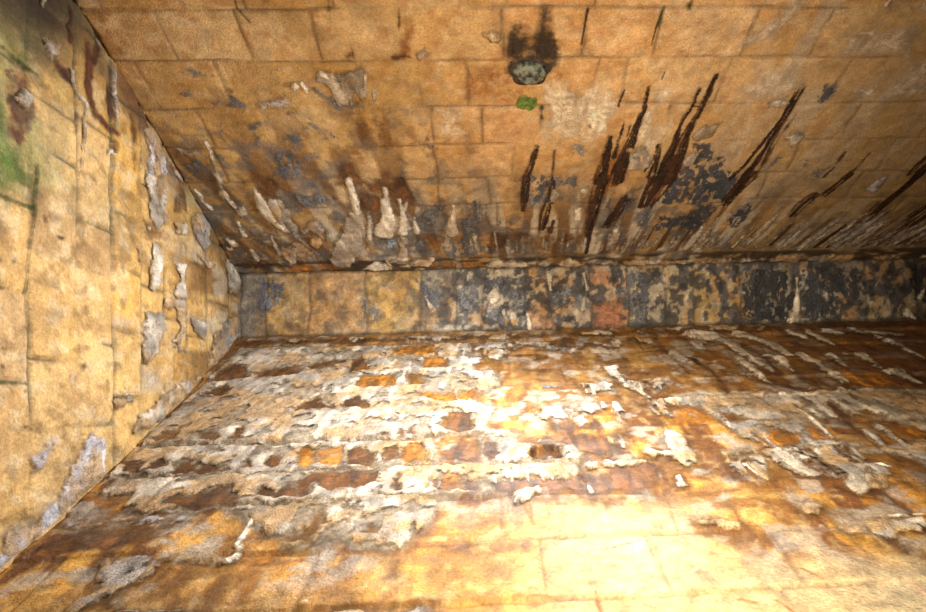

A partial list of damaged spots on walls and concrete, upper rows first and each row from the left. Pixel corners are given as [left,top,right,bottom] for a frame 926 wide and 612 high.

water stain [507,9,558,76]
water stain [43,9,119,165]
water stain [213,90,297,115]
water stain [313,69,376,111]
water stain [818,82,837,103]
water stain [131,114,340,293]
water stain [338,123,416,213]
water stain [402,72,804,269]
water stain [0,153,926,596]
water stain [65,555,159,612]
water stain [202,577,230,612]
water stain [334,603,435,612]